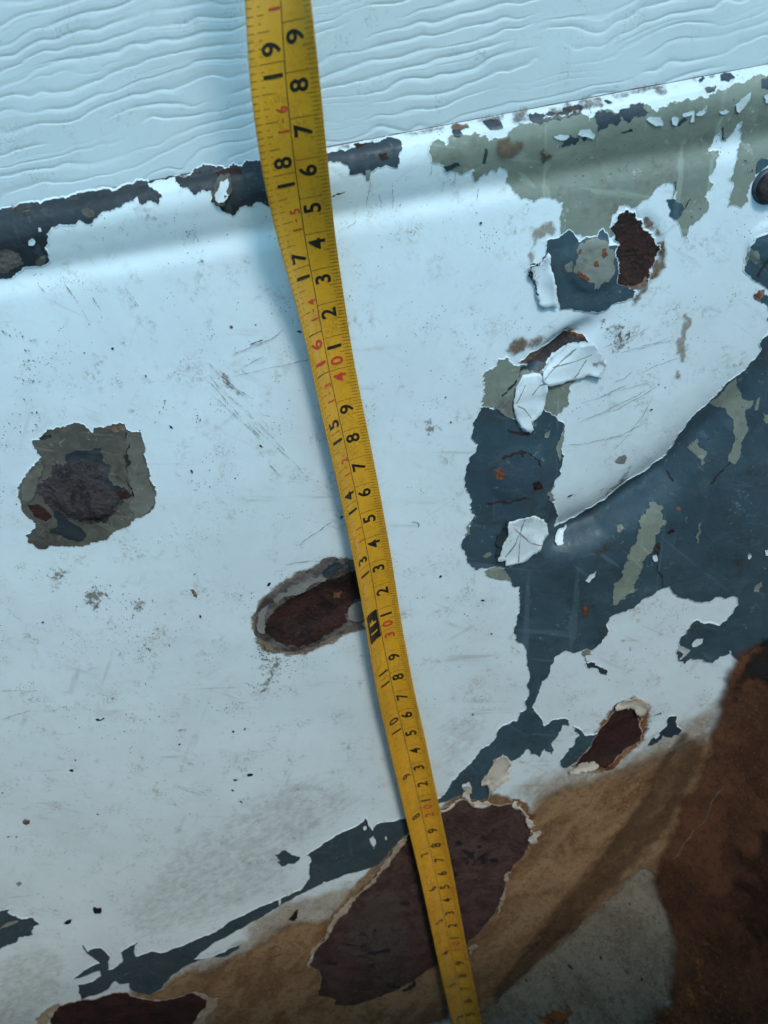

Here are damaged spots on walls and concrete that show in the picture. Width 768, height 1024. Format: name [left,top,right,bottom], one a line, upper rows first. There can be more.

peeling [0,158,270,280]
peeling [327,136,403,181]
peeling [427,72,768,314]
rust [634,217,666,303]
rust [508,337,543,363]
peeling [16,422,158,550]
rust [251,557,364,656]
peeling [438,333,768,803]
rust [442,645,768,1024]
peeling [0,909,40,950]
peeling [72,817,409,999]
rust [132,835,450,1024]